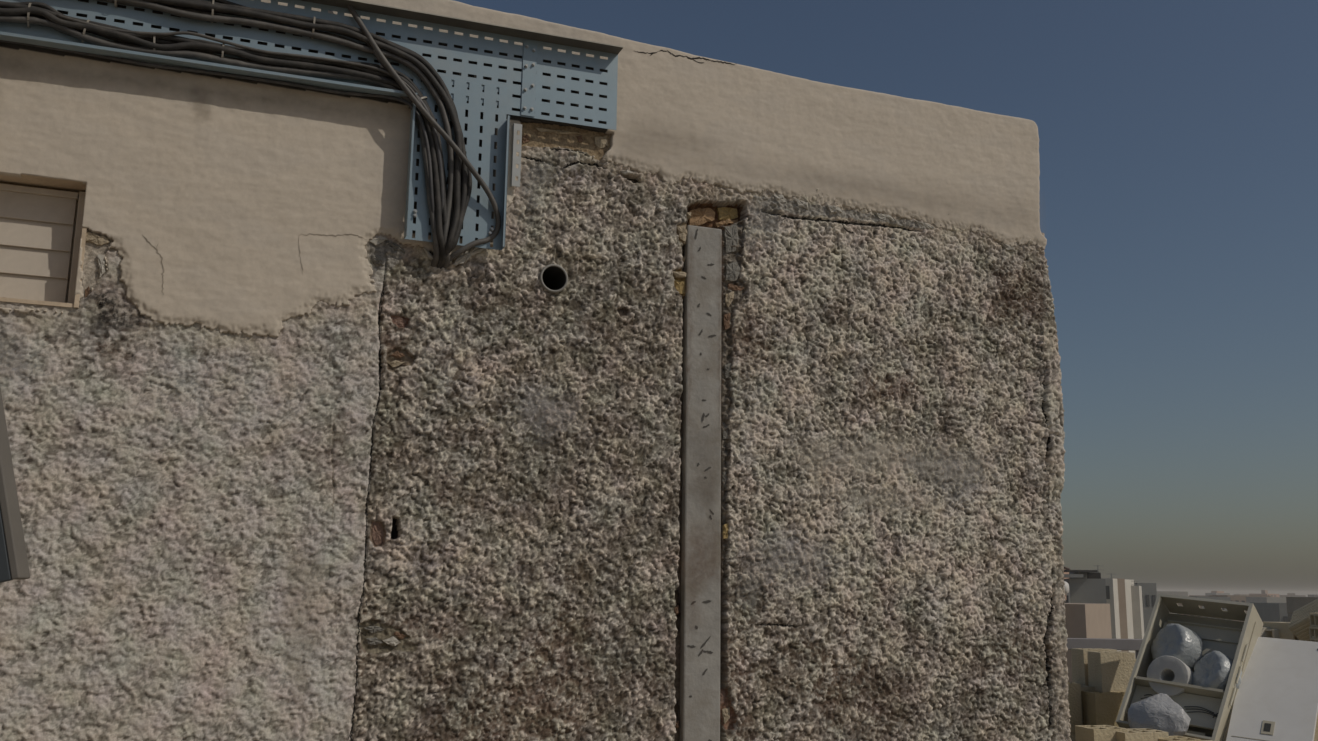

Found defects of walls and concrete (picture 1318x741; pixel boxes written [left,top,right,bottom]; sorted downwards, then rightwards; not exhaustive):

crack [635,50,736,65]
spalling [521,122,612,161]
crack [761,211,919,233]
spalling [81,229,113,298]
spalling [387,348,415,372]
spalling [673,194,935,577]
crack [1041,380,1058,456]
crack [1041,590,1056,730]